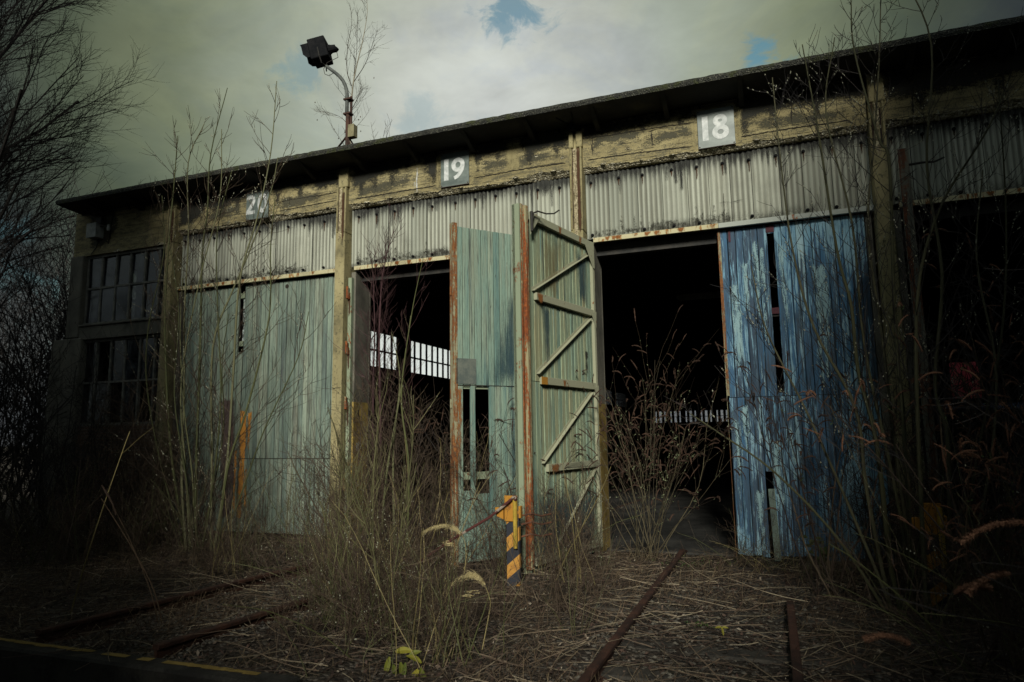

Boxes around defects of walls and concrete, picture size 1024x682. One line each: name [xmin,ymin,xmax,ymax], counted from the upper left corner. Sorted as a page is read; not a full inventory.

leakage [178,170,339,242]
leakage [351,77,867,226]
leakage [595,207,731,237]
peeling [731,242,769,366]
peeling [778,246,790,337]
peeling [811,264,832,383]